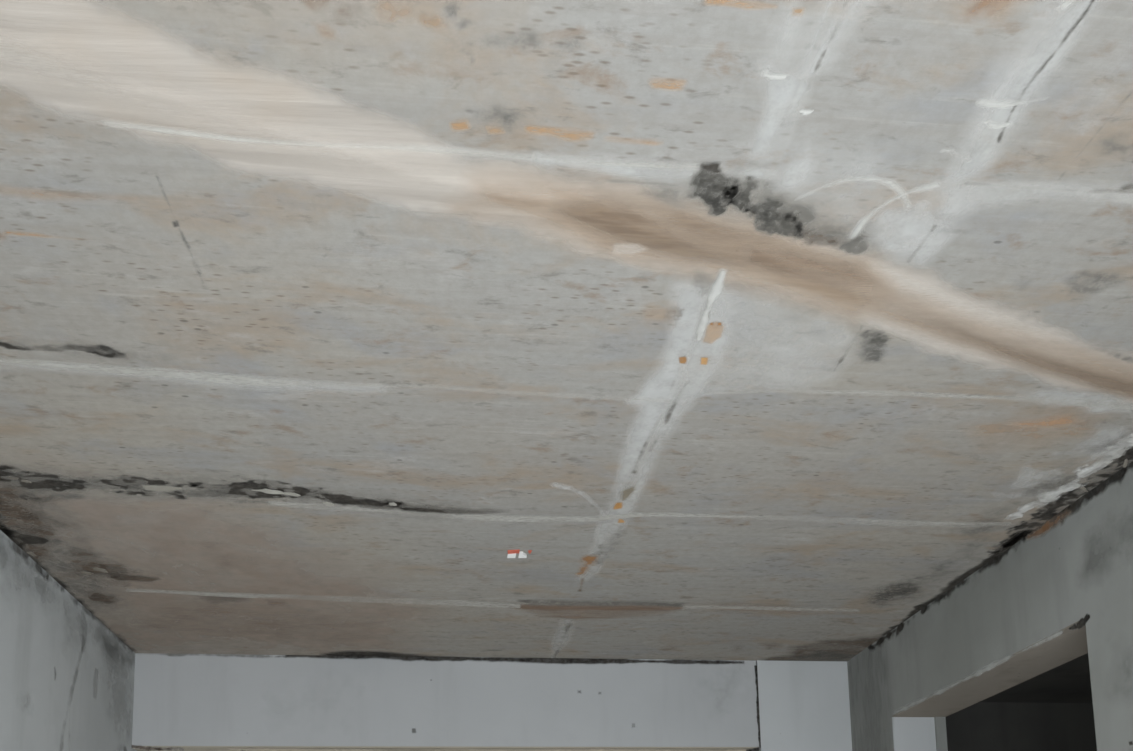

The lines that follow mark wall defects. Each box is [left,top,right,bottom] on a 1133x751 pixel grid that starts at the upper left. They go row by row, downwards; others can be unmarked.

crack [1034,0,1094,78]
damp [756,74,812,152]
damp [964,0,1096,170]
crack [0,342,125,358]
damp [486,163,872,571]
damp [862,331,888,362]
damp [977,338,1133,395]
damp [0,465,489,733]
damp [511,600,685,658]